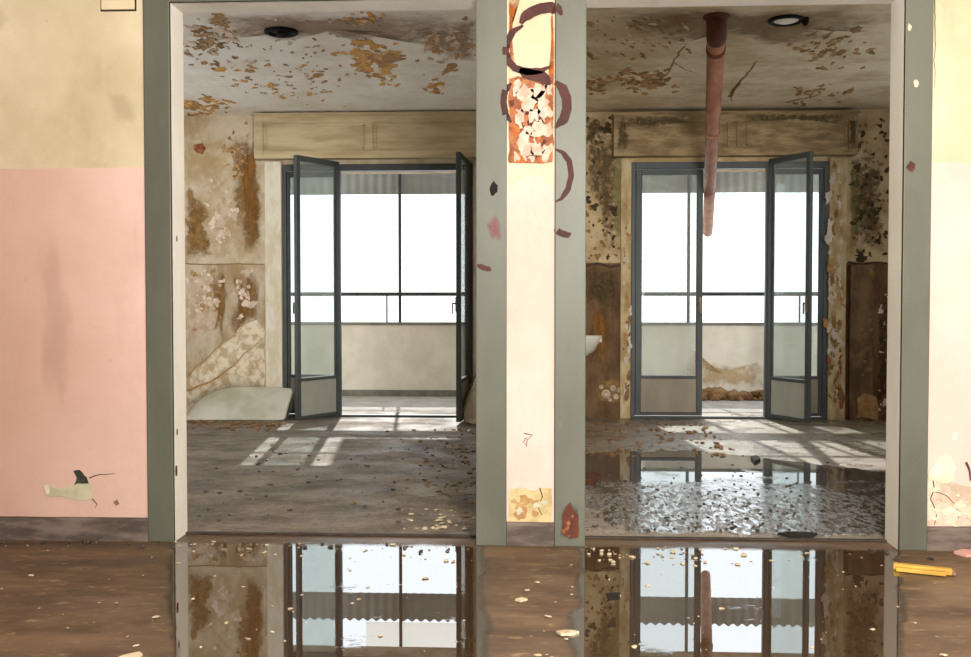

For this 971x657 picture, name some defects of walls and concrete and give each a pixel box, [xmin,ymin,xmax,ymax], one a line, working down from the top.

peeling [183,11,476,105]
peeling [586,15,692,96]
peeling [787,26,877,70]
peeling [184,94,236,116]
peeling [508,75,554,193]
leakage [747,114,890,262]
peeling [185,130,259,342]
peeling [43,470,115,508]
spalling [508,487,553,522]
corrosion [561,502,579,539]
crack [930,480,959,525]
peeling [927,454,971,527]